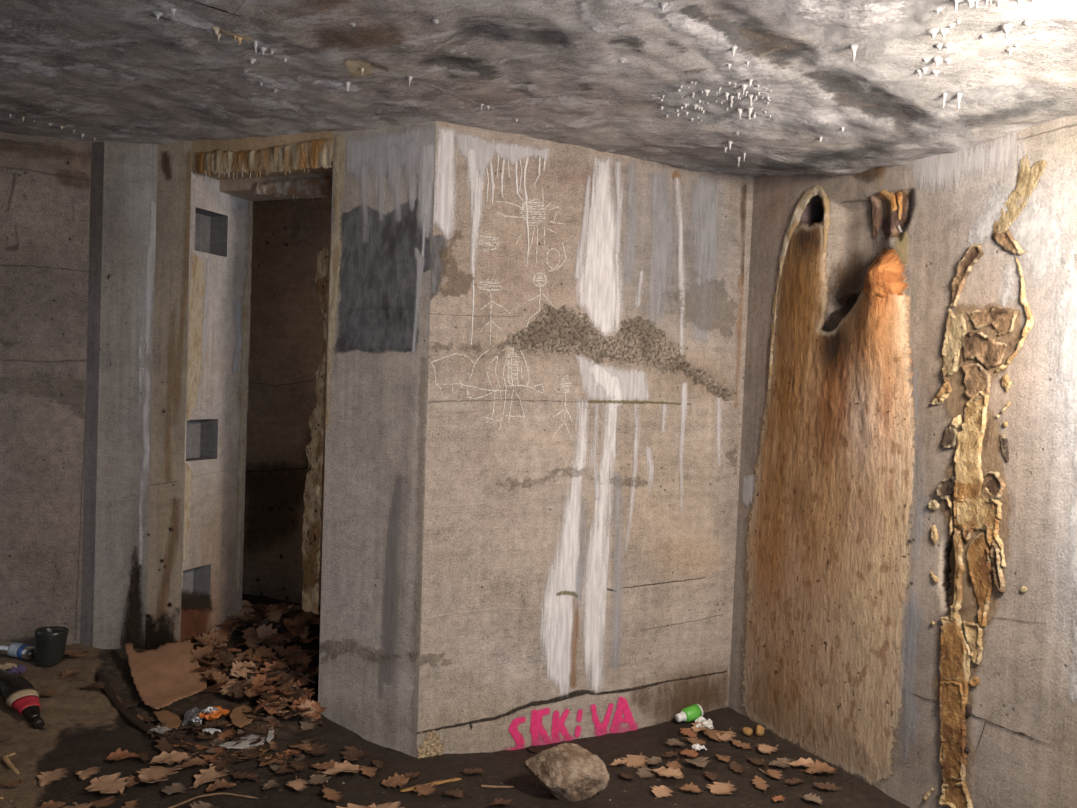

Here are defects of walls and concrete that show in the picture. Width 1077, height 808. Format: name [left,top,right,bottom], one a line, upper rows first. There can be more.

damp [580,0,1053,187]
damp [186,253,210,420]
damp [195,126,548,614]
damp [575,158,622,336]
damp [675,164,747,354]
spalling [870,189,910,244]
damp [969,184,1011,247]
damp [1014,199,1064,281]
damp [541,356,653,694]
peeling [923,154,1047,808]
crack [417,671,727,734]
crack [972,714,1051,750]